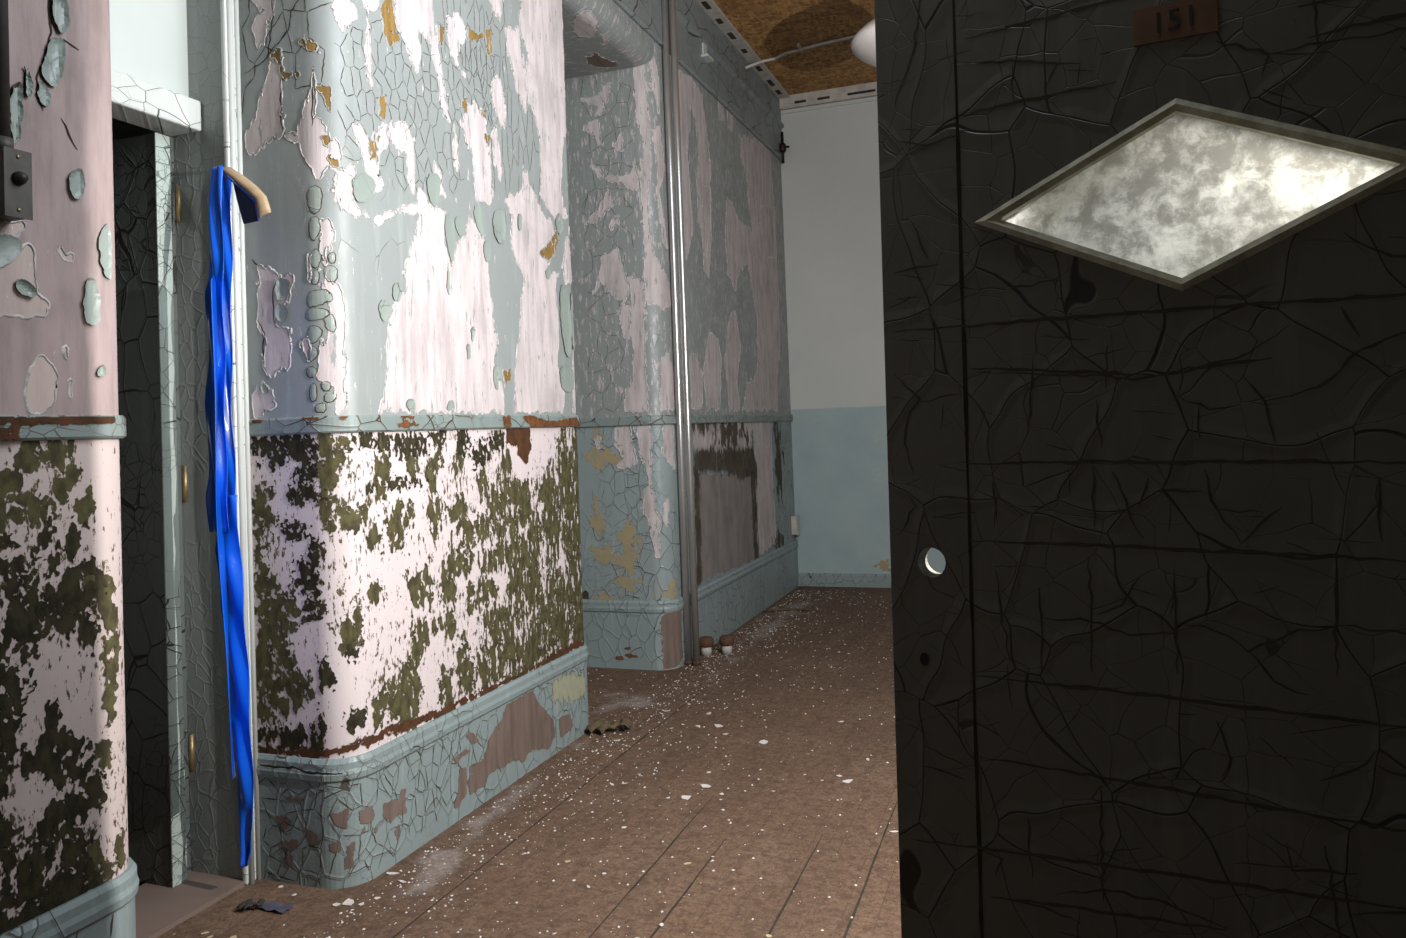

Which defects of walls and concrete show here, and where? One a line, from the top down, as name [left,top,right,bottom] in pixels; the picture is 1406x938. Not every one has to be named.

peeling [10,0,70,144]
crack [965,59,1081,103]
peeling [68,168,86,199]
peeling [0,220,51,320]
peeling [82,224,112,326]
peeling [244,0,780,583]
peeling [23,345,74,415]
corrosion [398,416,419,428]
corrosion [503,416,580,464]
leakage [250,422,785,758]
spalling [659,610,684,670]
crack [259,665,586,885]